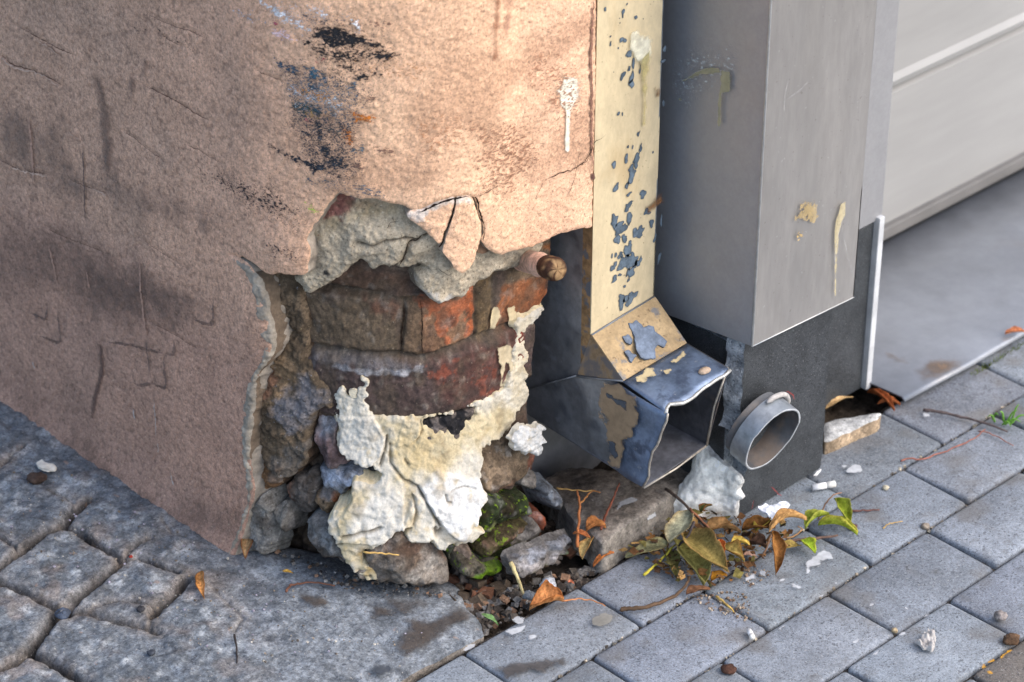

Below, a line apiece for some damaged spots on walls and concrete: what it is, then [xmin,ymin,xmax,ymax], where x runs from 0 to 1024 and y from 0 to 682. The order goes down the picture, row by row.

peeling [610,35,641,89]
crack [535,137,603,199]
crack [387,186,498,275]
peeling [610,132,662,311]
spalling [228,194,543,554]
peeling [622,320,686,382]
peeling [598,382,639,468]